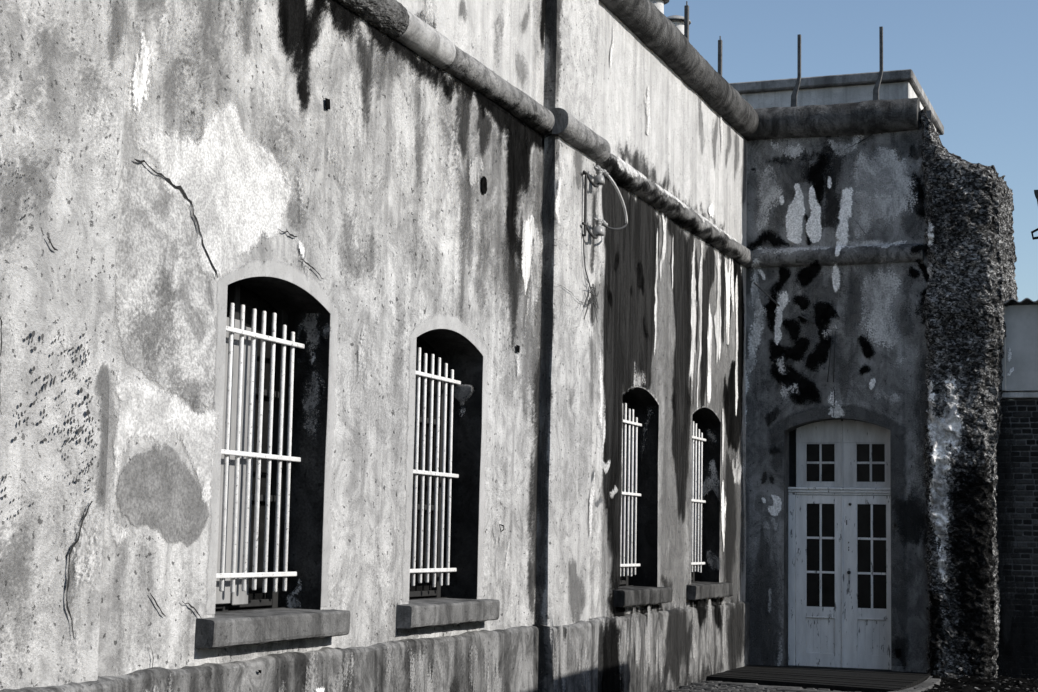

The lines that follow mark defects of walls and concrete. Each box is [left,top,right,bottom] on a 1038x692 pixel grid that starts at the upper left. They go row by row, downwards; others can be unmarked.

damp [242,0,256,53]
damp [893,133,934,324]
damp [278,0,584,692]
damp [589,98,876,692]
crack [66,501,92,637]